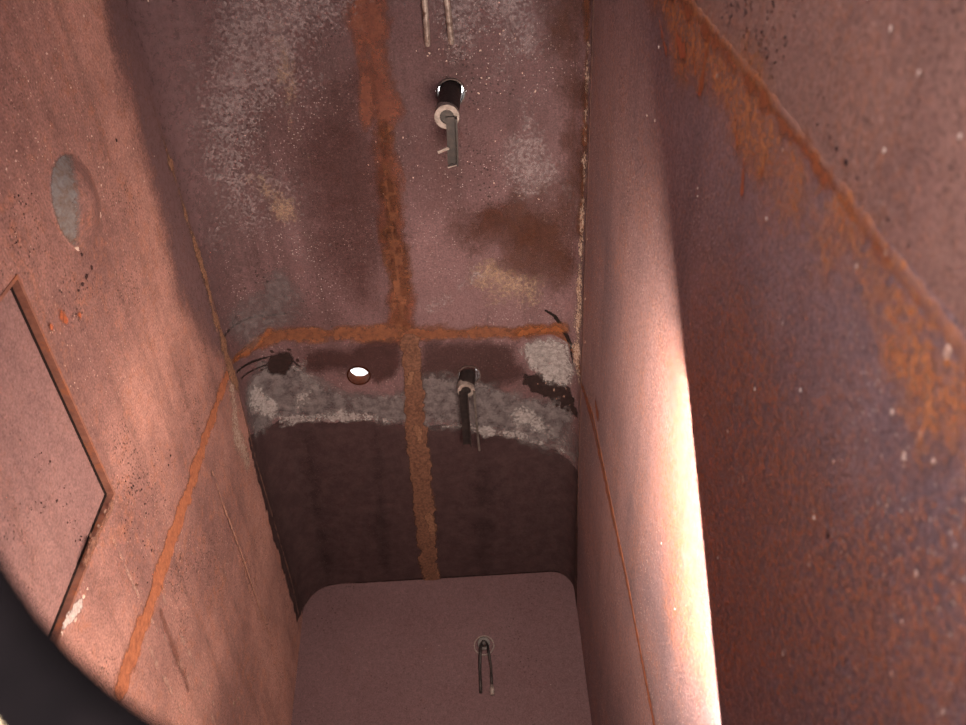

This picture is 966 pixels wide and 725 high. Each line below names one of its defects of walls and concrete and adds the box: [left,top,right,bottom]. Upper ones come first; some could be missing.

rust [654,0,831,225]
rust [115,0,569,696]
damp [470,259,536,304]
damp [525,338,574,385]
rust [883,290,966,448]